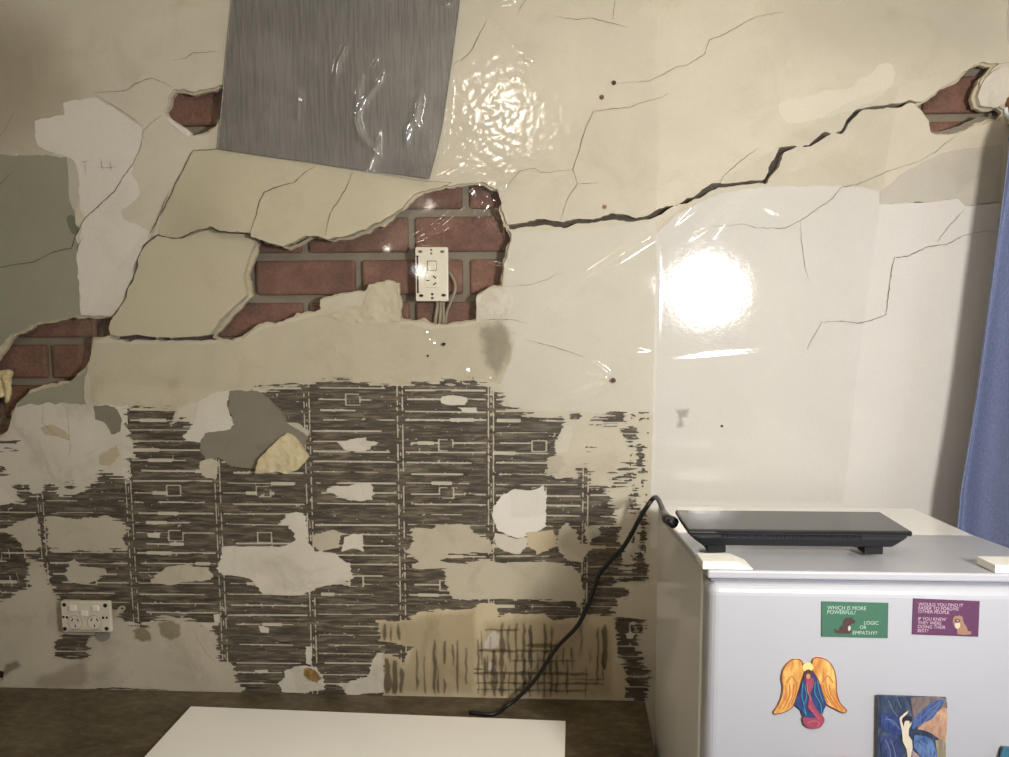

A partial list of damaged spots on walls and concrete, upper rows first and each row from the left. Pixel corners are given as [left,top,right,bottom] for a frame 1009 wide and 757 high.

crack [4,78,171,267]
flaking render [164,86,223,137]
crack [149,148,315,239]
crack [505,12,906,229]
flaking render [914,63,1009,136]
crack [120,332,225,341]
peeling [0,98,1004,548]
crack [807,213,992,349]
flaking render [0,513,244,692]
peeling [150,512,364,596]
peeling [278,646,326,693]
peeling [338,486,635,700]